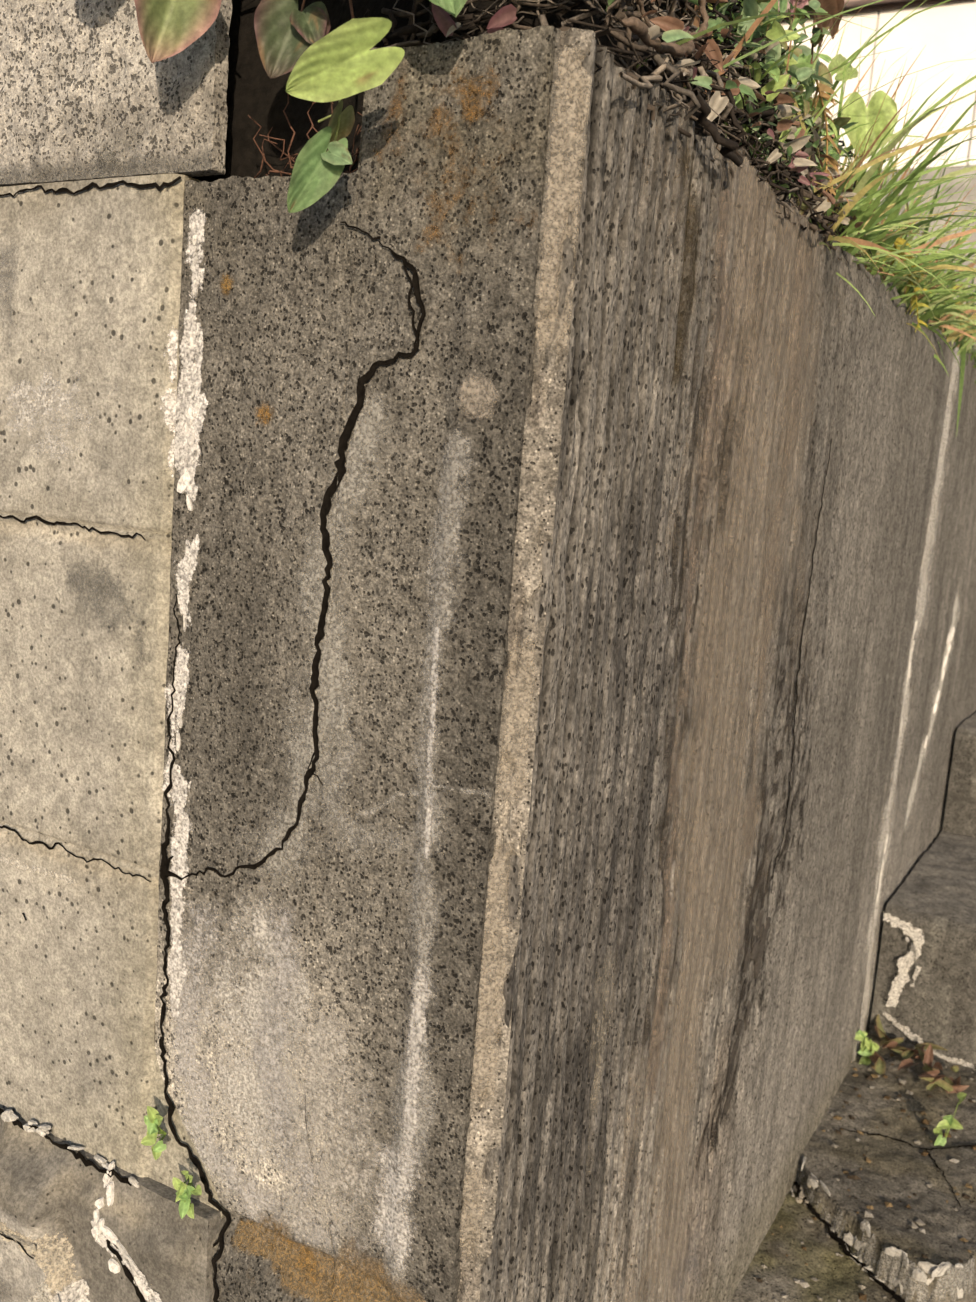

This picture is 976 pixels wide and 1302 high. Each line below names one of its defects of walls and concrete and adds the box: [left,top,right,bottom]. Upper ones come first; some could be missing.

water stain [642,153,805,1100]
crack [0,221,426,1302]
water stain [175,399,469,1278]
crack [345,786,475,836]
rust [234,1218,425,1302]
spalling [790,1156,976,1302]
crack [839,1128,974,1207]